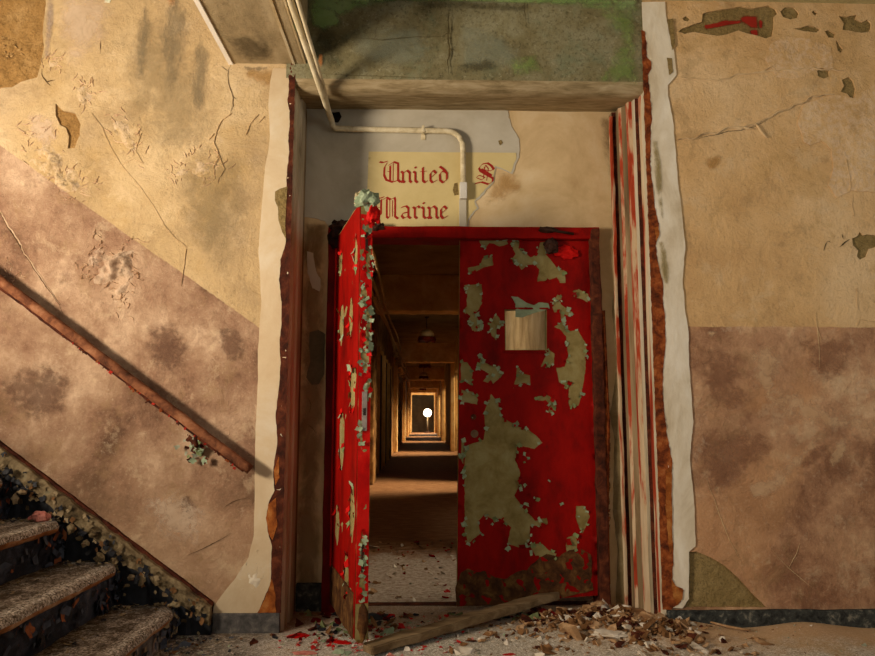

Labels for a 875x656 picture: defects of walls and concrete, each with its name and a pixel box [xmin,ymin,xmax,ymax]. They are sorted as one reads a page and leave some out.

spalling [0,0,46,88]
peeling [305,109,520,227]
crack [678,93,835,140]
crack [0,210,63,314]
flaking render [0,68,291,656]
peeling [336,221,375,446]
peeling [463,245,505,338]
peeling [458,353,529,431]
peeling [542,291,590,369]
corrosion [641,30,684,610]
flaking render [641,2,875,608]
peeling [332,480,369,603]